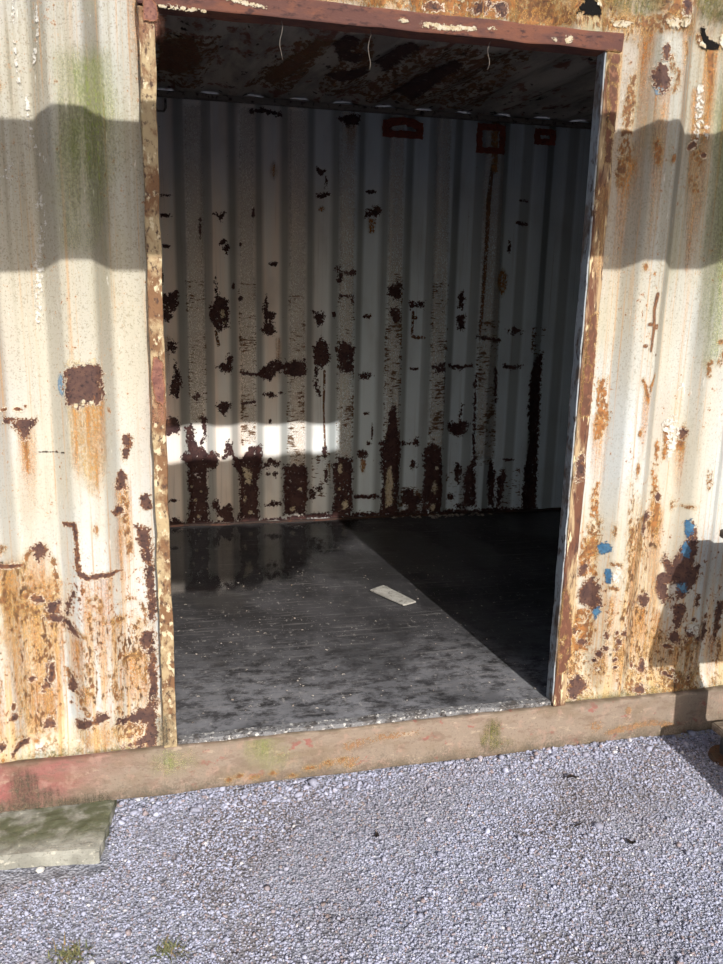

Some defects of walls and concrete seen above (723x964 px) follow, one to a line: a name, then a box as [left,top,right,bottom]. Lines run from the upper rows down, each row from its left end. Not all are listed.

rust [135,0,159,22]
peeling [597,0,706,102]
rust [668,0,694,19]
rust [357,0,653,221]
rust [316,166,331,211]
peeling [364,189,383,233]
rust [151,356,165,417]
peeling [162,274,546,524]
rust [580,313,612,451]
rust [642,375,655,414]
rust [558,441,723,702]
rust [0,545,64,734]